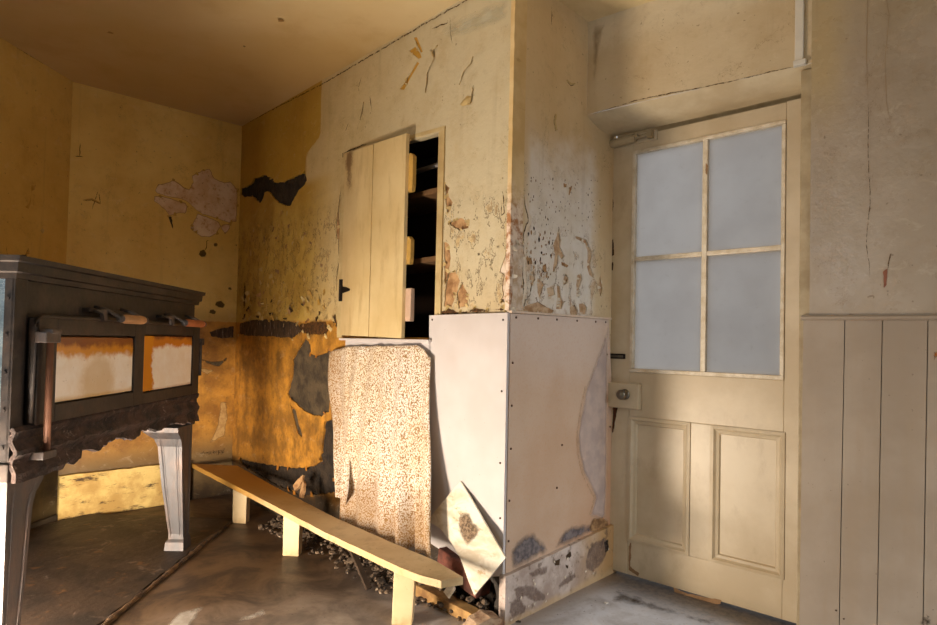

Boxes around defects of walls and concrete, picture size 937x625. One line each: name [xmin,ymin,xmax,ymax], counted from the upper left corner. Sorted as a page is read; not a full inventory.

crack [250,0,467,157]
crack [866,0,892,270]
spalling [154,169,307,237]
spalling [444,182,470,231]
spalling [443,242,469,309]
peeling [499,177,603,315]
spalling [210,287,337,497]
water stain [560,341,608,543]
spalling [444,581,497,609]
peeling [508,552,575,623]
peeling [585,538,609,574]